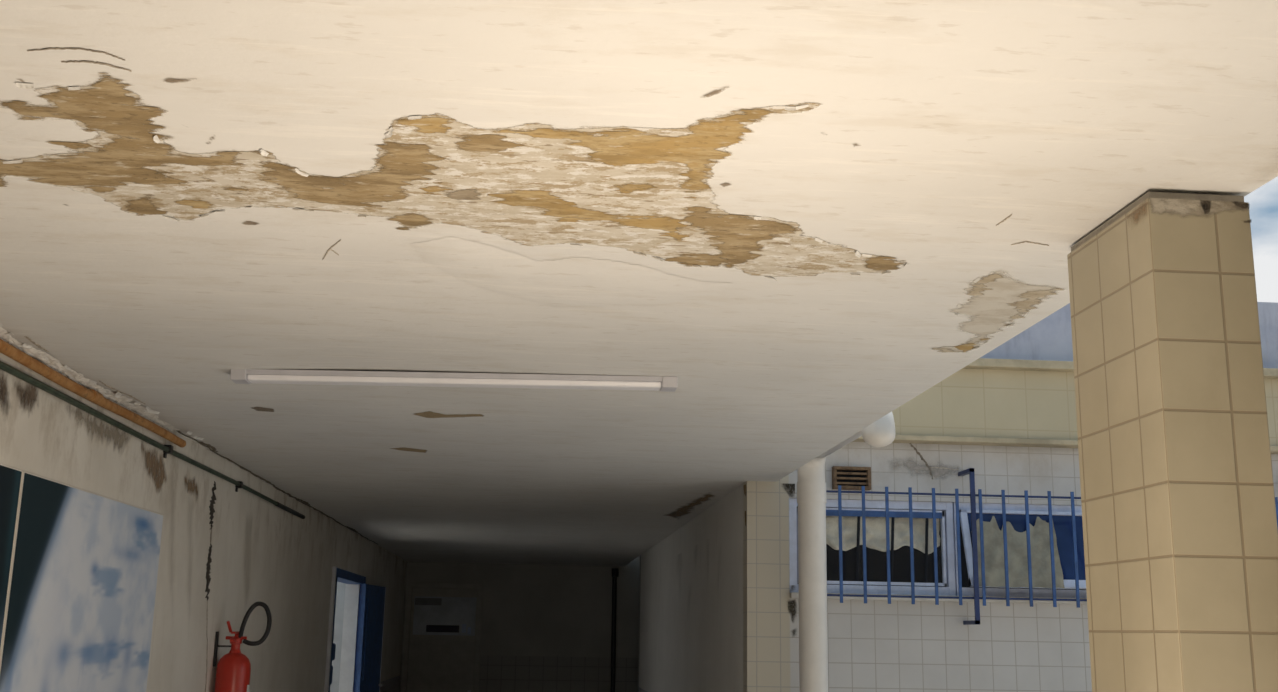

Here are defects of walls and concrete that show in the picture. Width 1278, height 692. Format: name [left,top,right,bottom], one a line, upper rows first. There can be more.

peeling [0,73,907,281]
peeling [933,272,1063,352]
damp [0,373,38,408]
spalling [0,322,204,440]
damp [141,445,166,489]
damp [185,477,198,494]
crack [176,430,377,692]